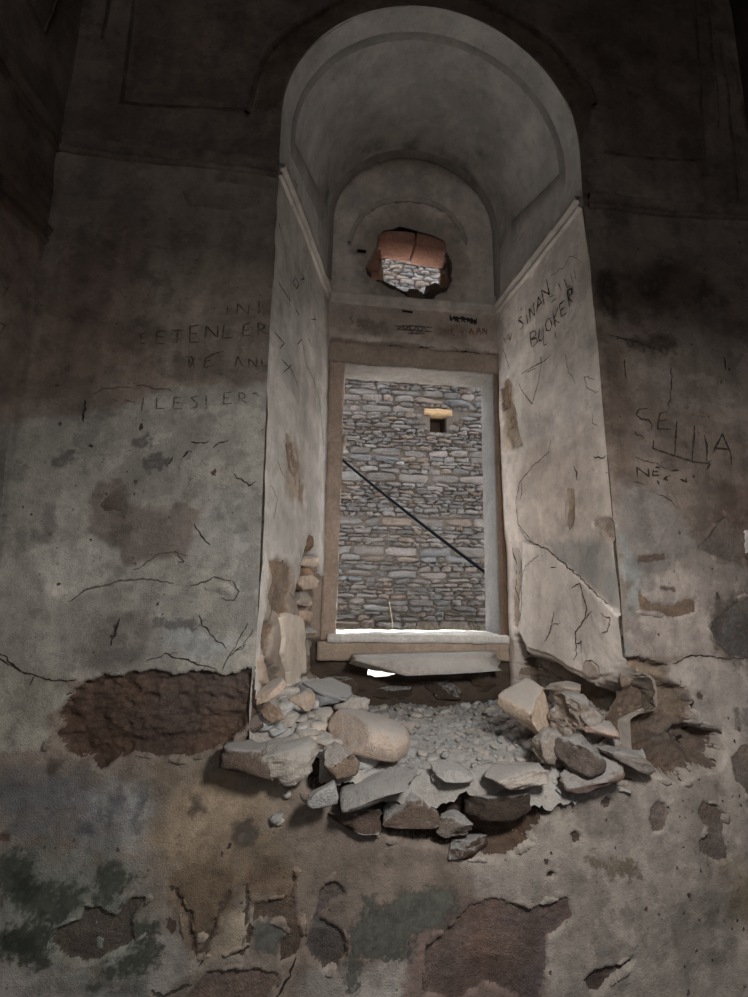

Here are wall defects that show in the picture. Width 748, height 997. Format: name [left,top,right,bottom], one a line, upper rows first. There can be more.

crack [69,524,239,602]
crack [512,440,611,679]
crack [0,654,74,684]
spalling [42,551,321,769]
crack [147,610,272,669]
spalling [299,760,352,801]
spalling [371,792,543,863]
crack [151,948,211,997]
peeling [166,867,353,997]
crack [276,958,296,997]
peeling [422,896,572,997]
peeling [584,957,632,990]